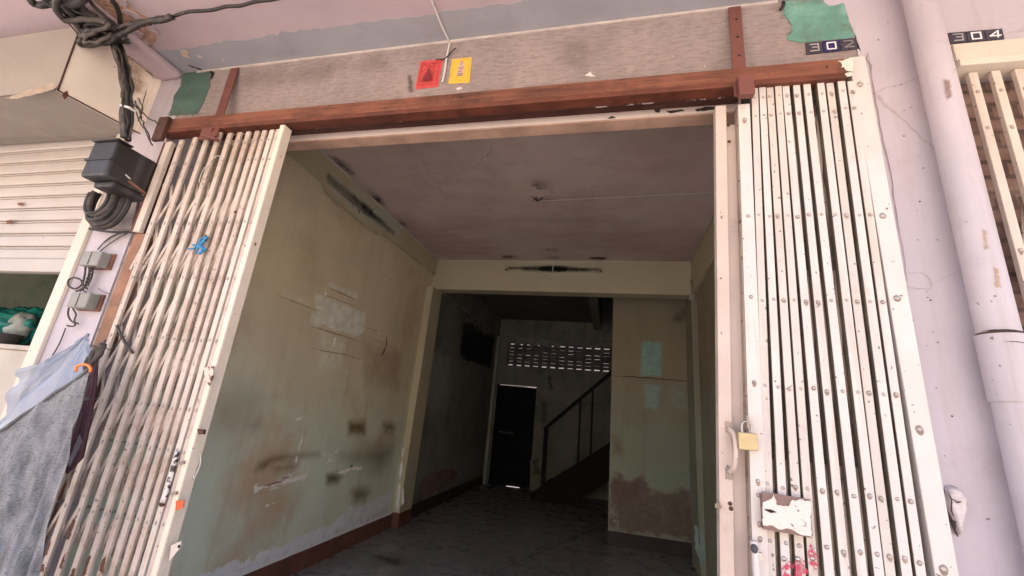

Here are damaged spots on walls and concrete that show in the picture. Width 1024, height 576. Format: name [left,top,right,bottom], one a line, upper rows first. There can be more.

flaking render [93,0,856,116]
crack [866,53,933,290]
peeling [254,437,307,507]
peeling [199,448,404,576]